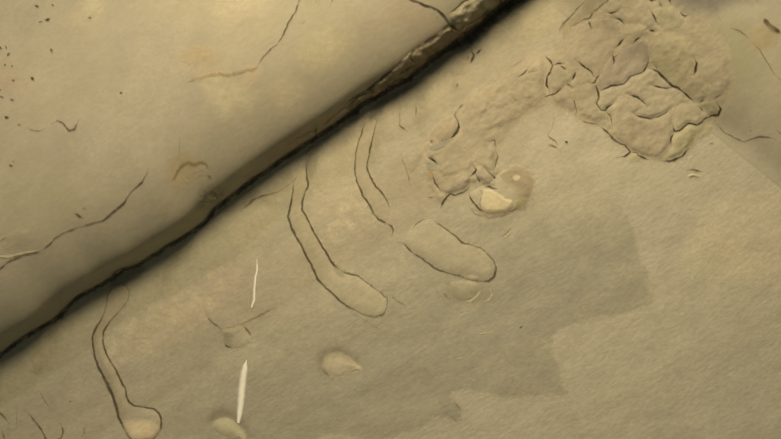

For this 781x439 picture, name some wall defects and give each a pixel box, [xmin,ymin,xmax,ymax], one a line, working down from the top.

crack [0,0,528,358]
crack [31,416,64,439]
water stain [164,208,652,439]